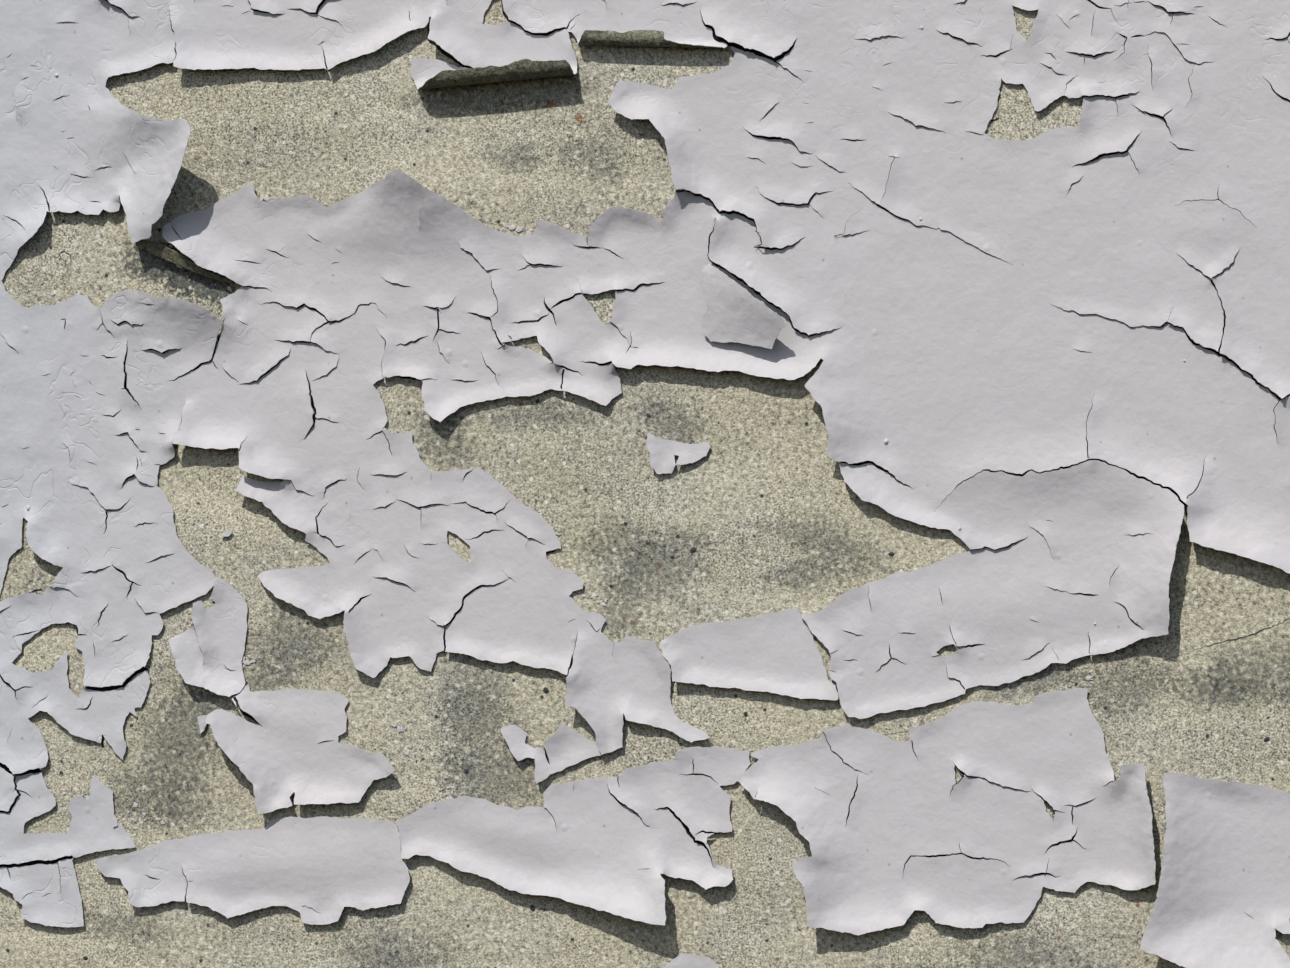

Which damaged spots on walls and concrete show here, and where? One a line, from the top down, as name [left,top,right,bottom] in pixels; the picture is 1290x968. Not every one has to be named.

crack [501,0,607,36]
crack [662,0,1013,337]
crack [1041,0,1224,193]
crack [43,236,665,533]
crack [292,431,556,609]
peeling [2,0,970,652]
crack [842,397,1205,511]
crack [1053,184,1290,440]
crack [0,733,42,813]
crack [79,666,147,710]
peeling [0,428,1290,968]
crack [902,762,1113,881]